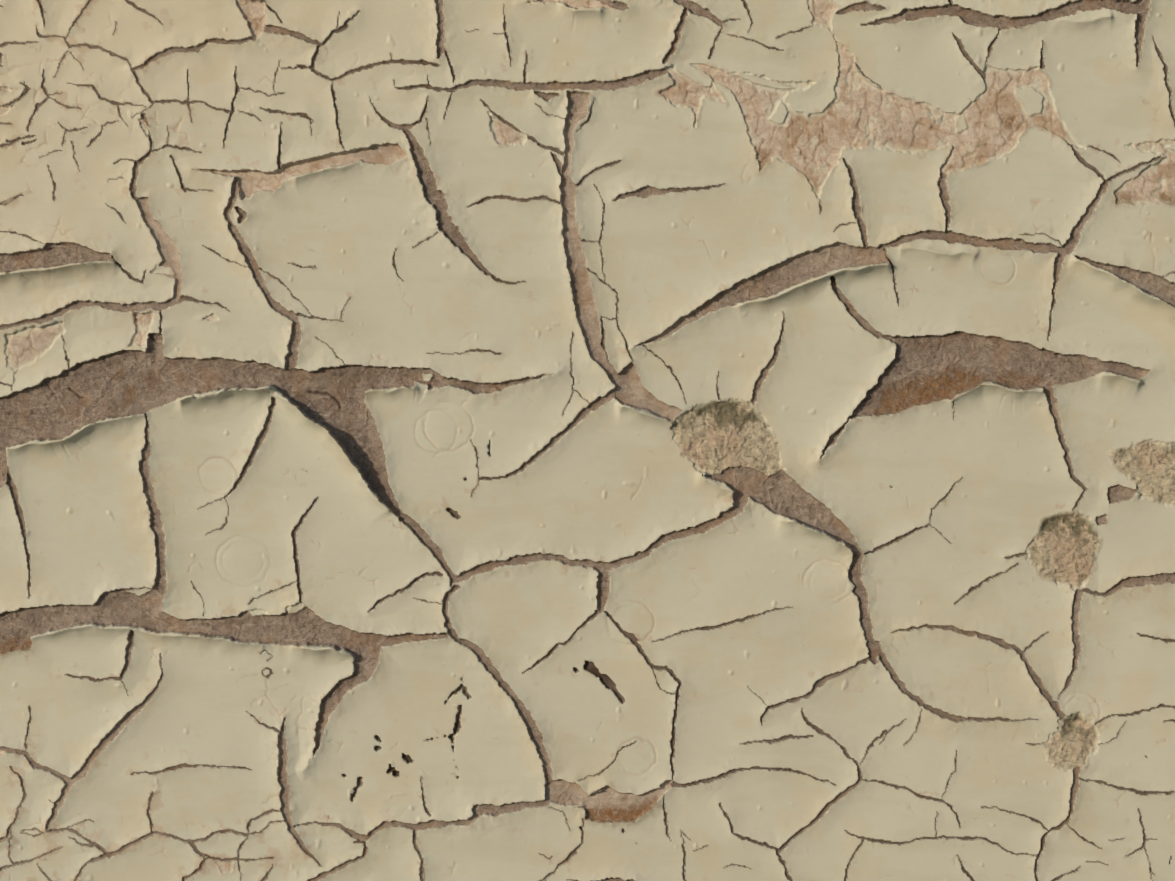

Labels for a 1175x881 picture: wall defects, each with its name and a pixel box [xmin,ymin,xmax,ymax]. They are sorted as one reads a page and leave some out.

peeling [659,0,1087,200]
peeling [1113,138,1175,206]
spalling [0,242,113,281]
spalling [136,197,183,305]
crack [0,0,1175,510]
crack [138,412,205,616]
crack [198,397,276,535]
spalling [0,310,552,517]
spalling [820,331,1151,460]
crack [0,466,1175,881]
spalling [544,779,673,833]